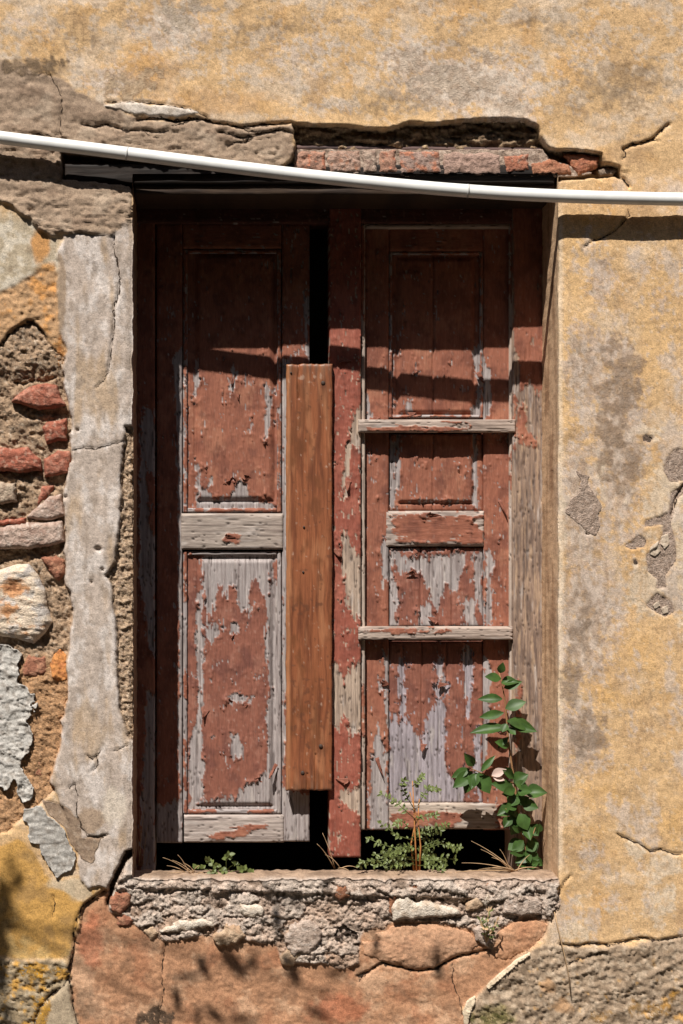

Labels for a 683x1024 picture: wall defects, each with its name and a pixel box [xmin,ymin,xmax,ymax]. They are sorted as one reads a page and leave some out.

peeling [105,102,198,119]
crack [584,125,668,247]
peeling [565,470,602,535]
peeling [625,448,683,616]
spalling [0,322,105,878]
crack [617,833,678,855]
flaking render [486,952,531,989]
flaking render [462,995,475,1024]